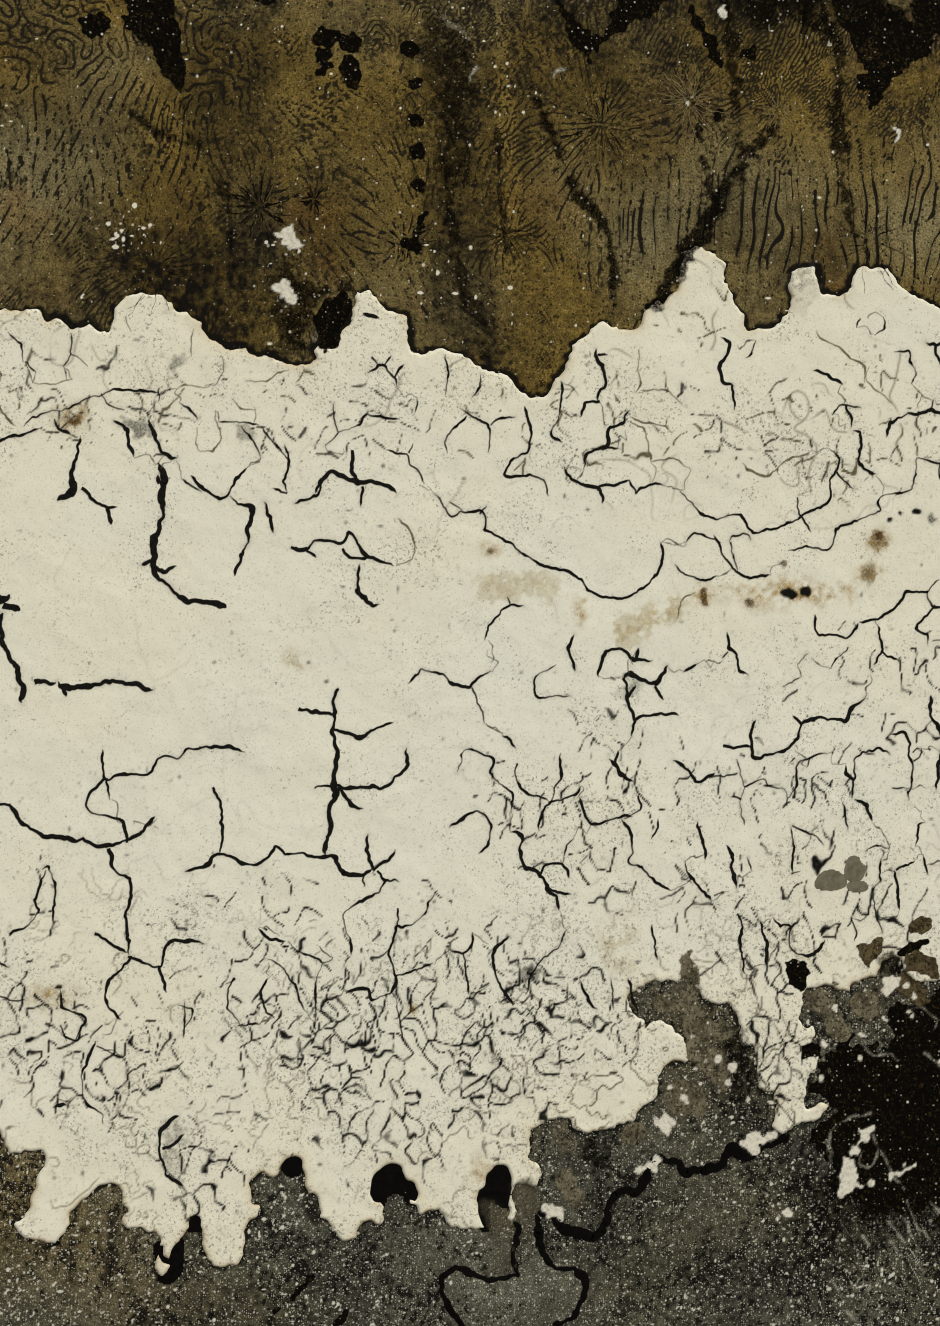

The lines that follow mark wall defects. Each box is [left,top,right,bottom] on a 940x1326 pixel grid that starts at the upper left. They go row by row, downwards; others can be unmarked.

leakage [78,0,200,149]
crack [223,164,325,238]
leakage [273,264,353,353]
leakage [312,25,362,90]
leakage [400,8,485,324]
peeling [0,0,940,398]
crack [0,189,940,616]
leakage [555,0,667,64]
leakage [647,0,940,311]
crack [0,580,940,1267]
peeling [0,916,940,1326]
leakage [801,987,940,1222]